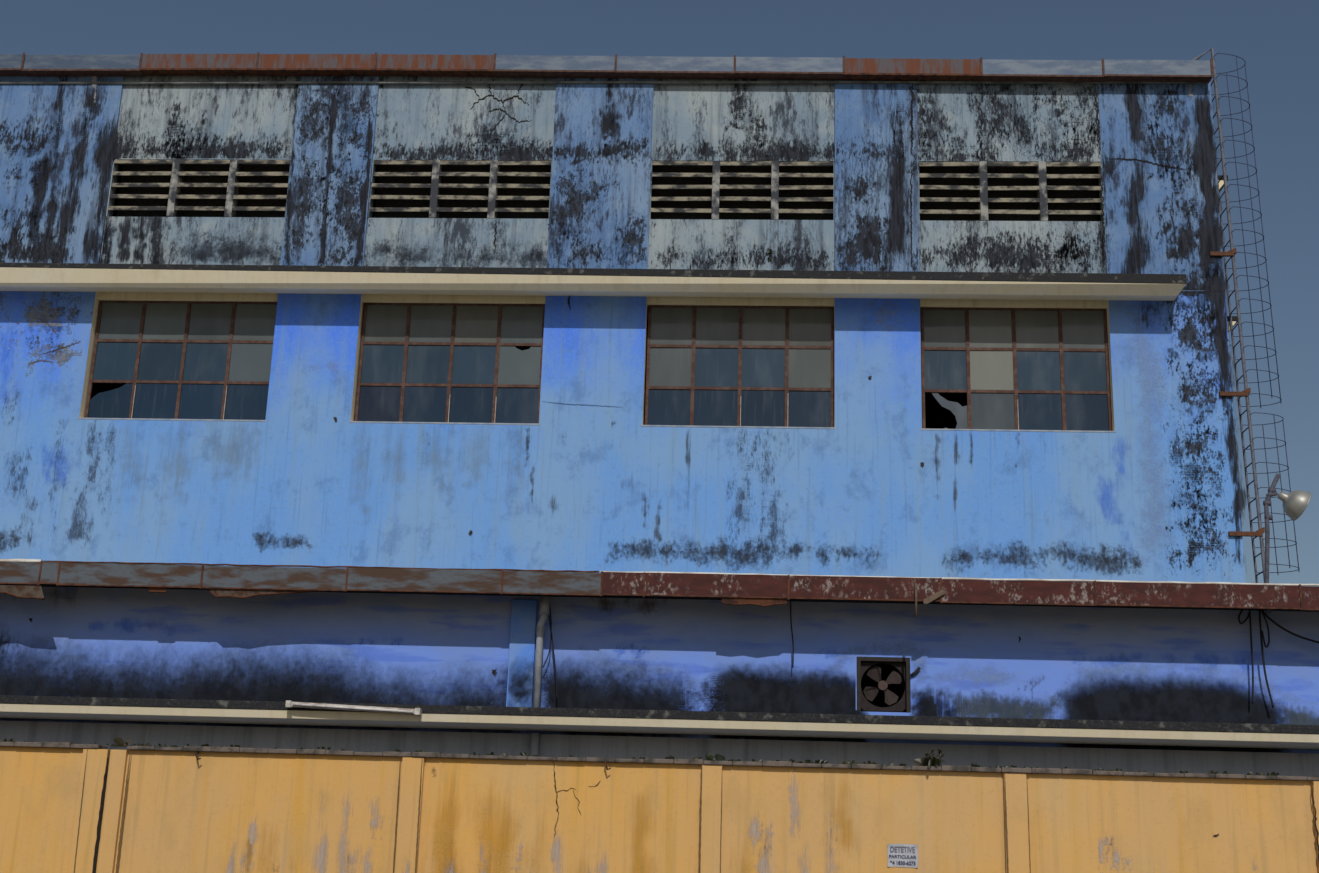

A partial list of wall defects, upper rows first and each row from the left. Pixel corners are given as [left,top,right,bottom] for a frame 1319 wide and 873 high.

crack [464,79,533,136]
damp [0,76,1247,575]
rust [0,582,643,600]
damp [0,635,866,715]
damp [82,720,419,731]
crack [74,748,131,873]
crack [553,763,601,837]